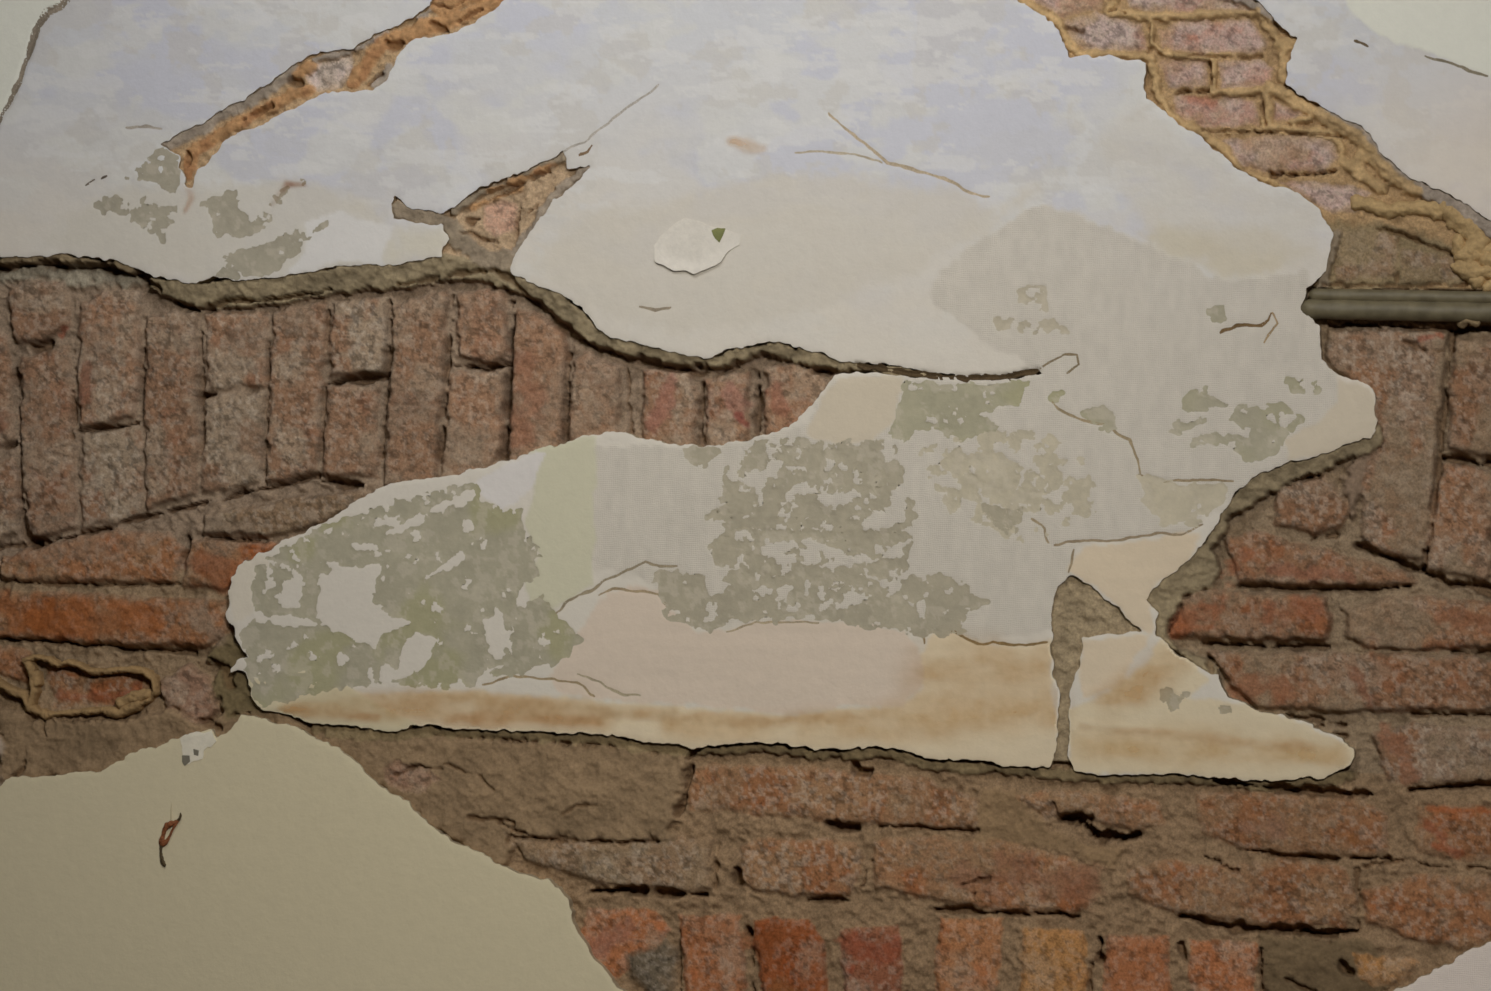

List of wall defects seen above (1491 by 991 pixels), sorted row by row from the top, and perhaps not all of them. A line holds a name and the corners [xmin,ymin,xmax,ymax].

crack [0,0,70,123]
flaking render [1018,0,1491,299]
peeling [993,285,1070,335]
peeling [1206,305,1227,324]
flaking render [0,147,926,786]
flaking render [237,319,1491,991]
peeling [159,803,182,867]